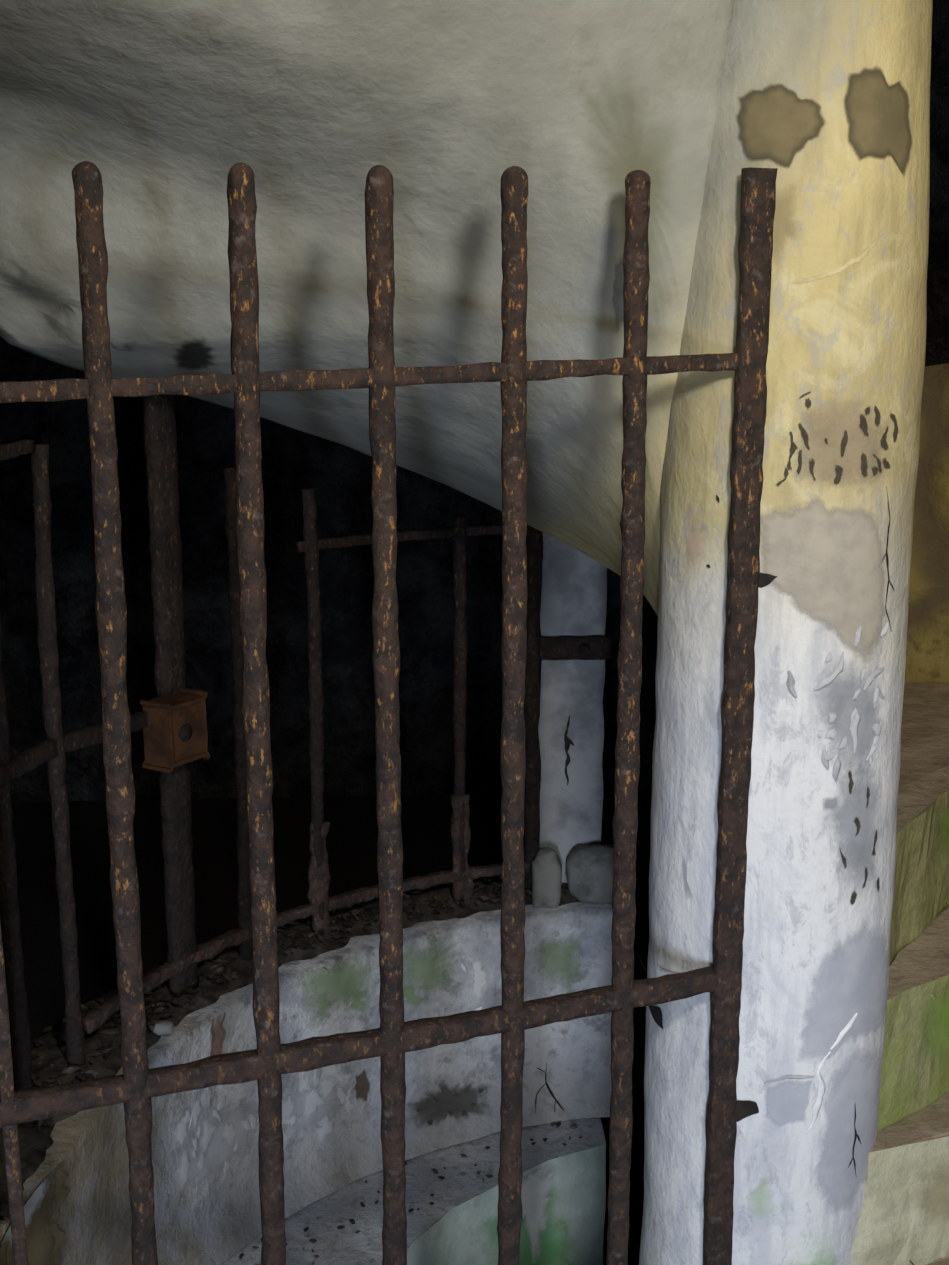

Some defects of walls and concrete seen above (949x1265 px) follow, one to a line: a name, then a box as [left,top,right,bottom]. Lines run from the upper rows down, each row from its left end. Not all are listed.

peeling [777,392,898,486]
crack [882,487,894,632]
spalling [760,501,889,905]
crack [564,716,574,785]
crack [848,1105,861,1178]